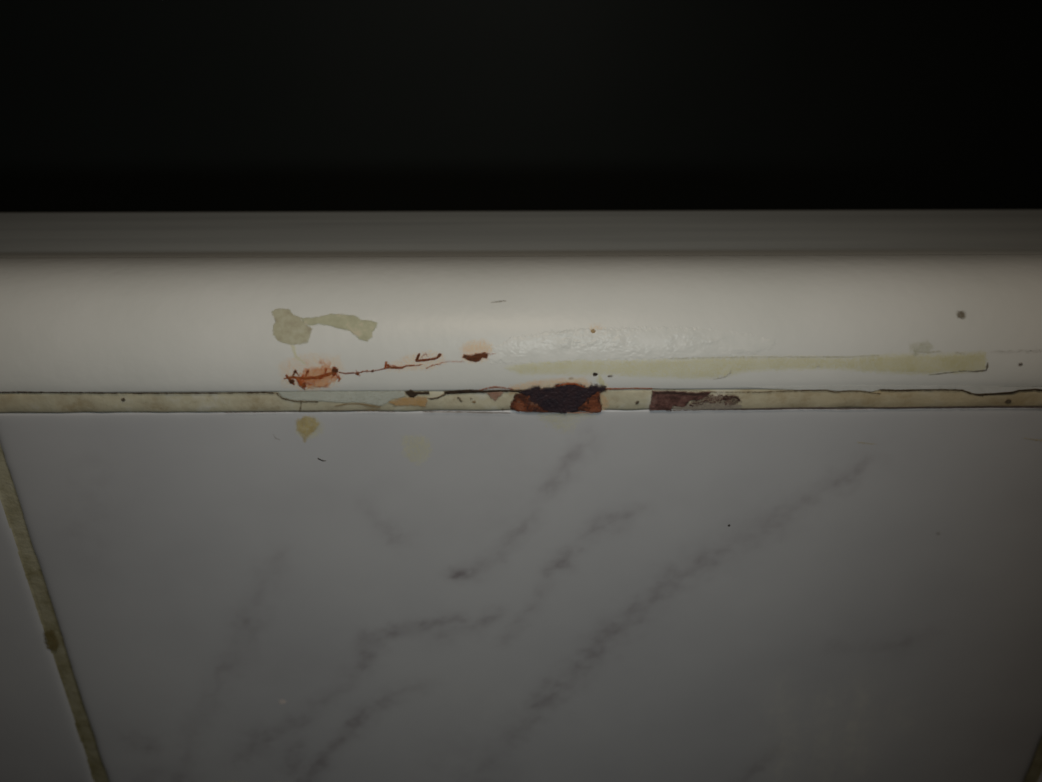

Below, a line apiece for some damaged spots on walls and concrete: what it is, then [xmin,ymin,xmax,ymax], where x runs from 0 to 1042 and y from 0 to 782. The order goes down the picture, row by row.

peeling [272,308,378,364]
rust [442,339,495,364]
leakage [504,342,1038,380]
rust [488,372,742,435]
crack [653,388,1042,412]